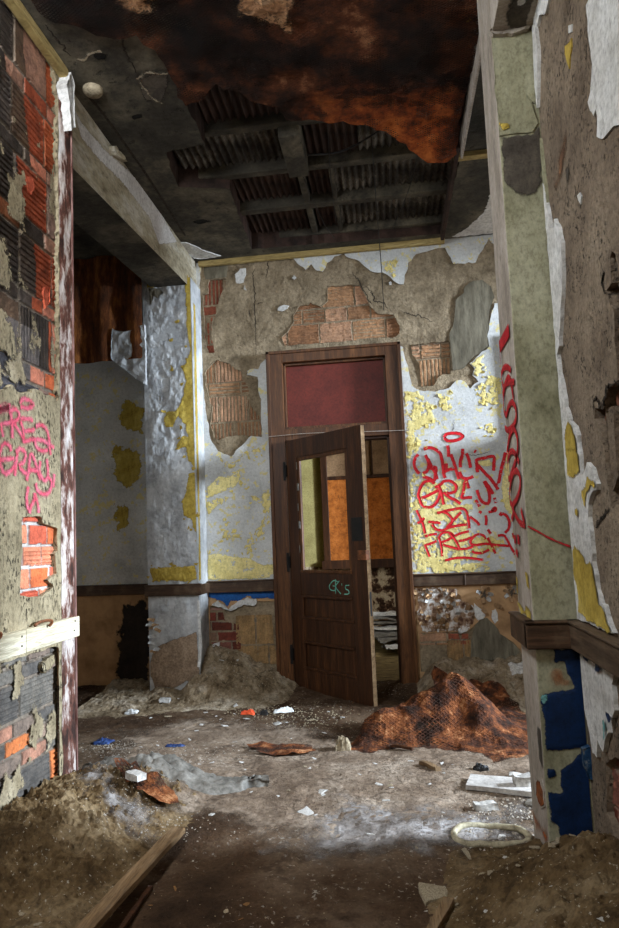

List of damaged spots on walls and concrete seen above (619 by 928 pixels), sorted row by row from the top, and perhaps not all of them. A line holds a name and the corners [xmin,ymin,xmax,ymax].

spalling [0,0,514,583]
peeling [489,0,619,633]
spalling [20,516,58,597]
spalling [146,591,277,688]
peeling [371,567,396,627]
spalling [414,572,531,672]
spalling [0,647,58,811]
peeling [533,649,619,842]